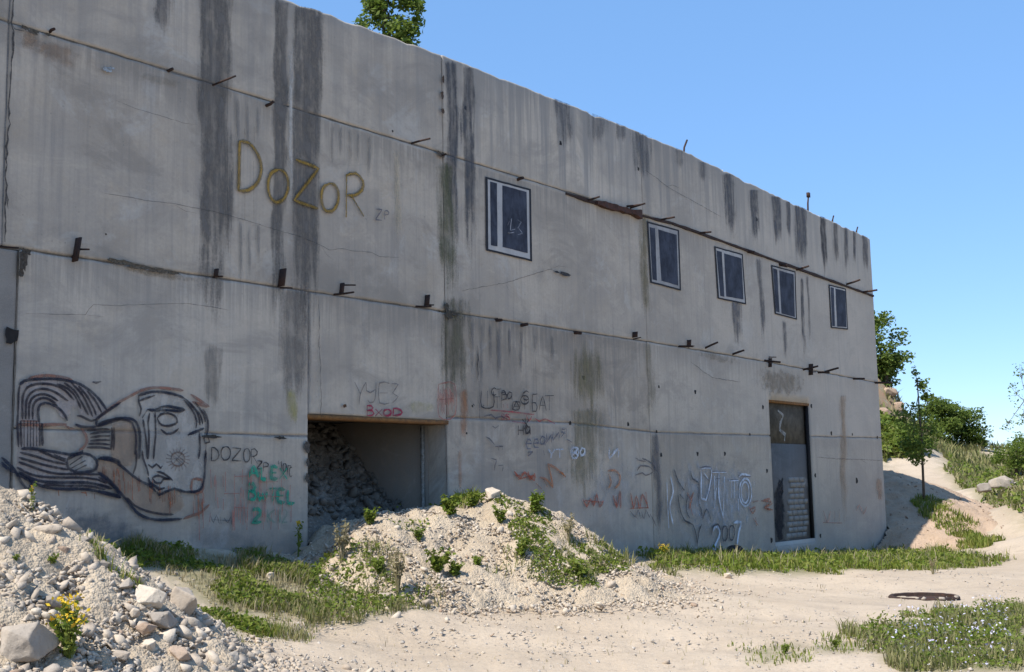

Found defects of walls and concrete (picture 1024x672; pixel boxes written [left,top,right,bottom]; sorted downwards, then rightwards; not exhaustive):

damp [198,0,233,270]
damp [272,0,322,306]
damp [446,62,475,236]
damp [636,132,649,172]
damp [724,174,734,227]
damp [750,190,759,234]
damp [772,196,807,253]
damp [820,217,868,265]